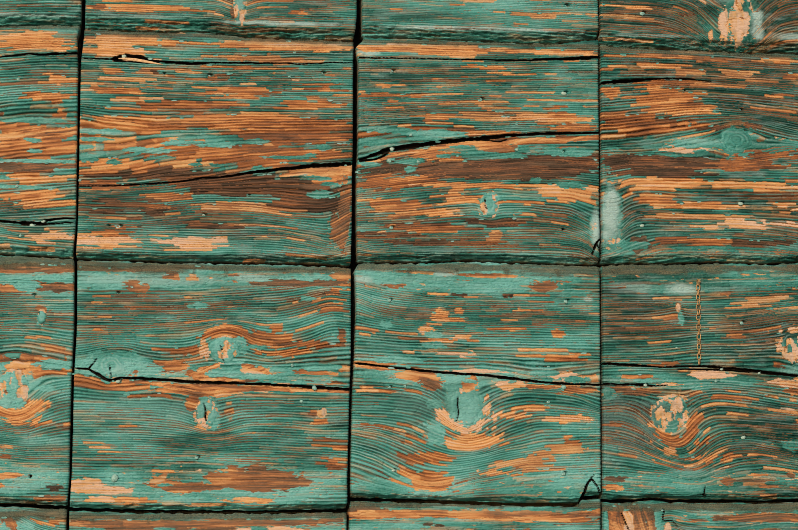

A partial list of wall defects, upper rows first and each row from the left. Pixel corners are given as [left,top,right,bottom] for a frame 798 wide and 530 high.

crack [79,131,599,187]
crack [0,217,75,226]
peeling [0,263,97,293]
peeling [418,307,478,358]
peeling [0,324,395,430]
crack [75,345,350,391]
peeling [354,348,600,394]
crack [355,362,798,387]
peeling [312,436,348,473]
peeling [361,394,591,492]
peeling [603,475,628,491]
peeling [31,503,798,530]